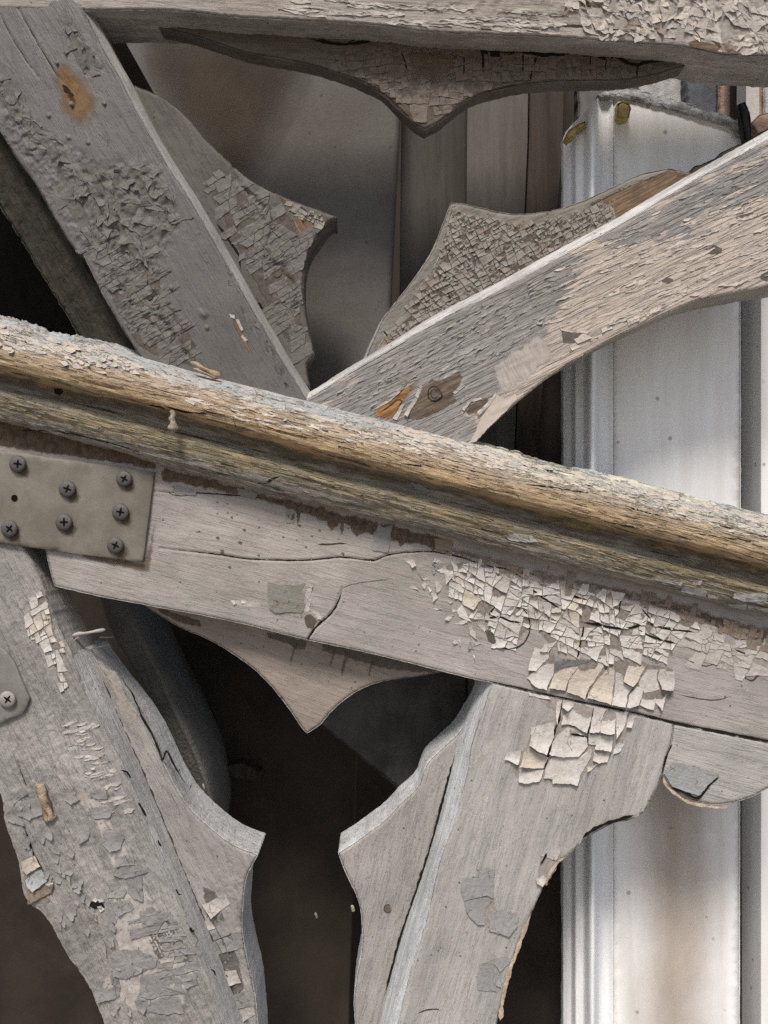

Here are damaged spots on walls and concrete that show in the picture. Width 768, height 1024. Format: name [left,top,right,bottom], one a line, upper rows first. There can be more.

rust [59,68,91,120]
peeling [327,41,740,138]
peeling [0,68,768,536]
peeling [24,589,68,692]
peeling [405,538,496,658]
crack [169,543,768,681]
peeling [504,623,768,786]
peeling [651,577,768,613]
peeling [665,763,719,796]
peeling [7,720,198,1024]
crack [384,756,455,995]
peeling [201,888,255,1023]